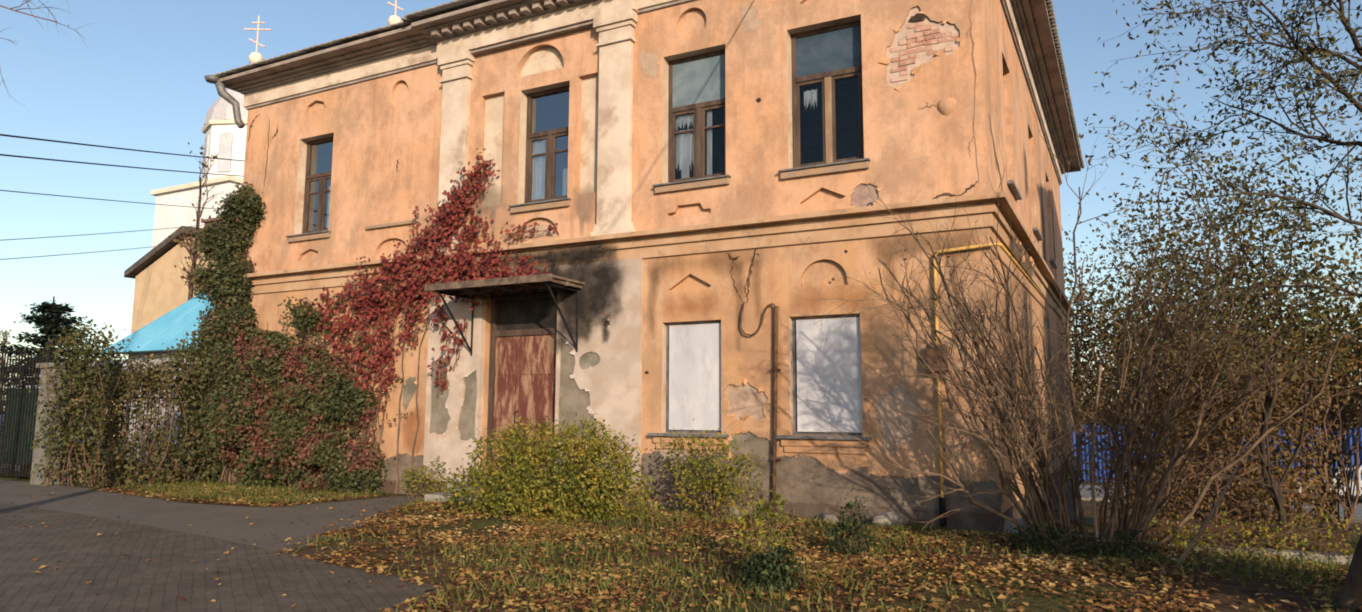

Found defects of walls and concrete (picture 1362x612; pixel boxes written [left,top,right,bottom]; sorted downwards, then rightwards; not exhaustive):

flaking render [879,6,963,91]
flaking render [849,182,883,207]
damp [584,306,608,340]
flaking render [402,355,477,441]
flaking render [557,338,600,444]
flaking render [640,378,1002,513]